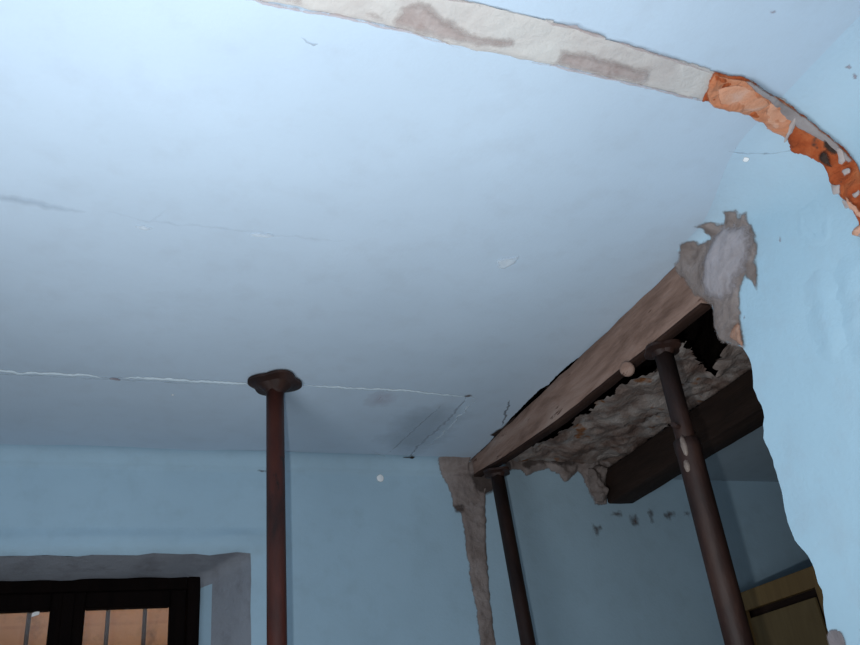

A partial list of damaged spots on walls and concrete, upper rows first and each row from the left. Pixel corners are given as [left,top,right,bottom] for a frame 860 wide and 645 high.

water stain [396,6,512,46]
water stain [559,54,647,82]
spalling [673,308,729,375]
crack [0,369,248,385]
crack [302,385,472,397]
spalling [491,358,578,441]
spalling [539,360,658,442]
peeling [680,436,690,472]
flaking render [827,630,845,645]